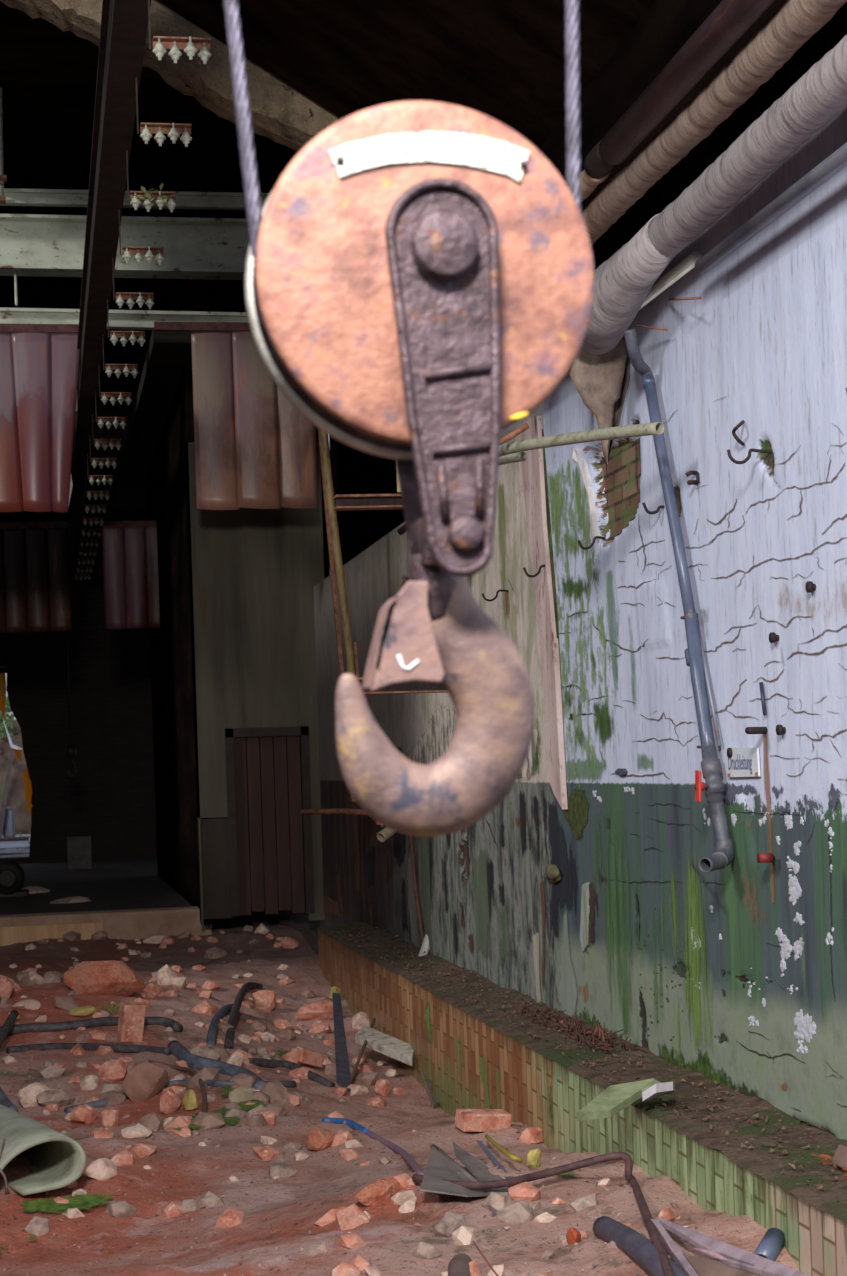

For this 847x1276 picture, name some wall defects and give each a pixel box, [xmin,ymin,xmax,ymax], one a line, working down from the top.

water stain [565,466,587,552]
flaking render [572,418,641,546]
crack [558,424,847,885]
water stain [575,702,613,744]
water stain [442,834,458,952]
water stain [472,850,510,961]
water stain [530,797,540,865]
water stain [532,932,541,1002]
water stain [557,912,577,1017]
peeling [721,812,805,1027]
peeling [824,819,834,872]
peeling [793,1009,816,1054]